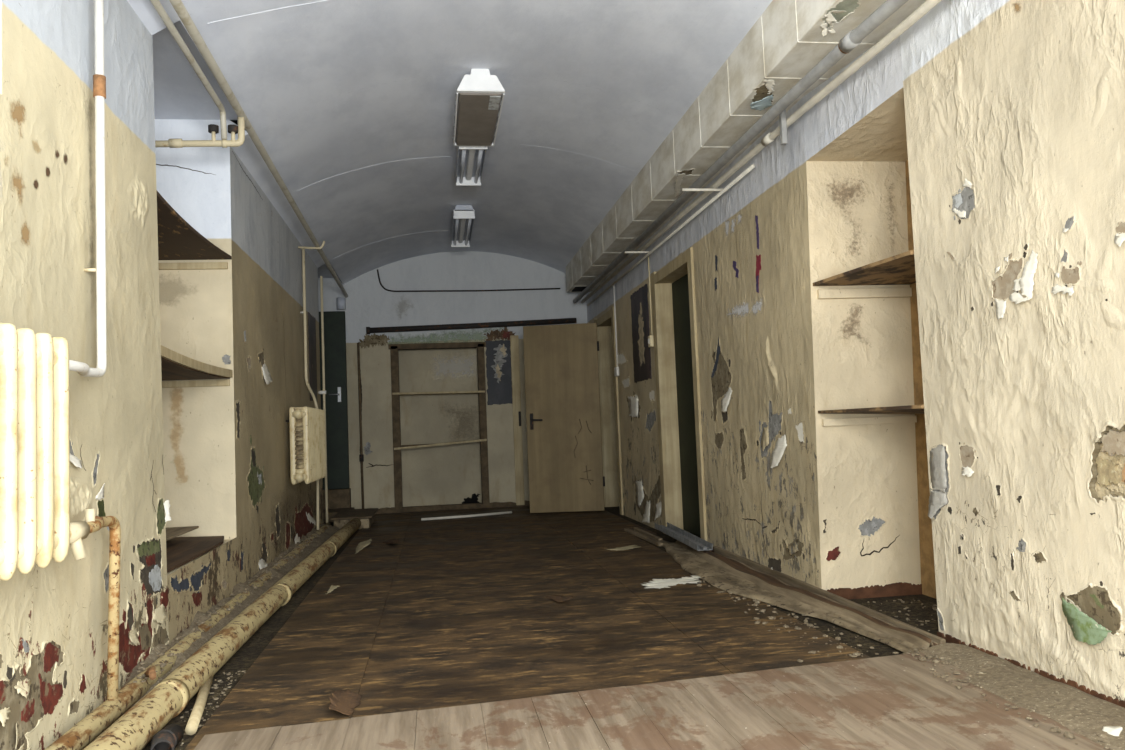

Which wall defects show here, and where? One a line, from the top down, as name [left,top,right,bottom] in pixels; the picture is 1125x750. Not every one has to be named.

peeling [820,0,862,38]
rust [11,104,25,124]
peeling [949,178,977,224]
peeling [991,243,1038,320]
peeling [1051,248,1082,296]
peeling [710,335,805,481]
peeling [70,439,109,532]
peeling [928,442,978,522]
spalling [1086,420,1125,516]
peeling [119,497,212,675]
peeling [1060,581,1124,645]
peeling [0,637,87,750]